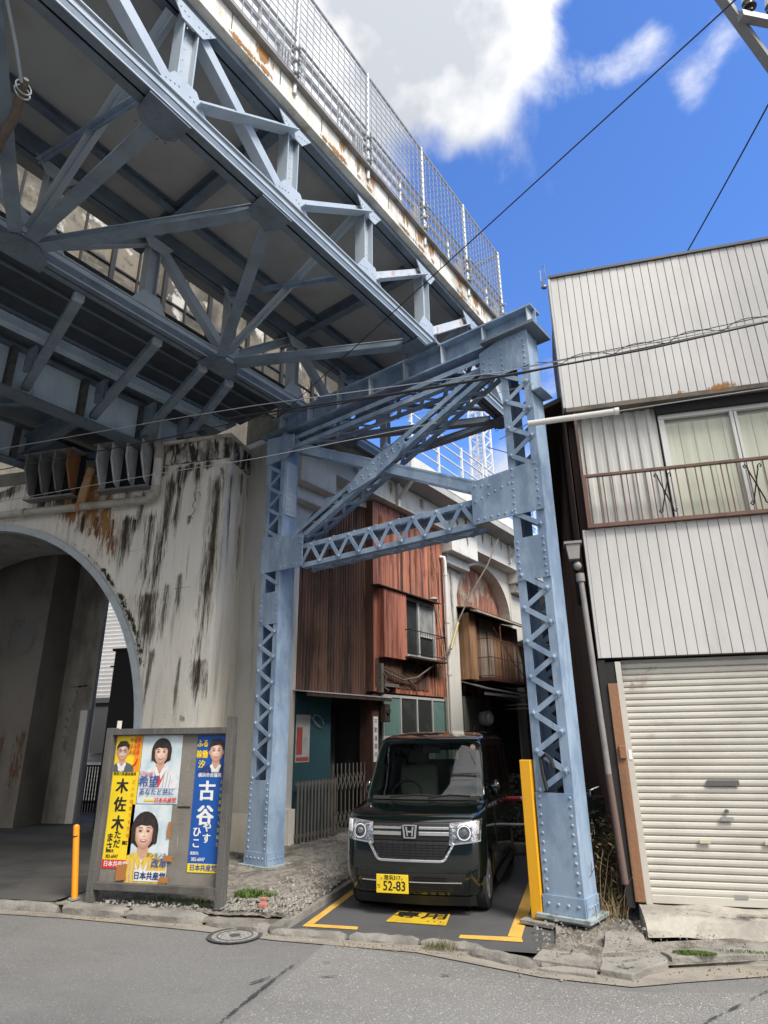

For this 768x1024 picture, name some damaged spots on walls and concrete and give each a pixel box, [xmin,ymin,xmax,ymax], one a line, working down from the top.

corrosion [256,42,274,77]
corrosion [339,139,374,191]
corrosion [401,212,434,264]
corrosion [59,476,118,562]
water stain [109,461,248,708]